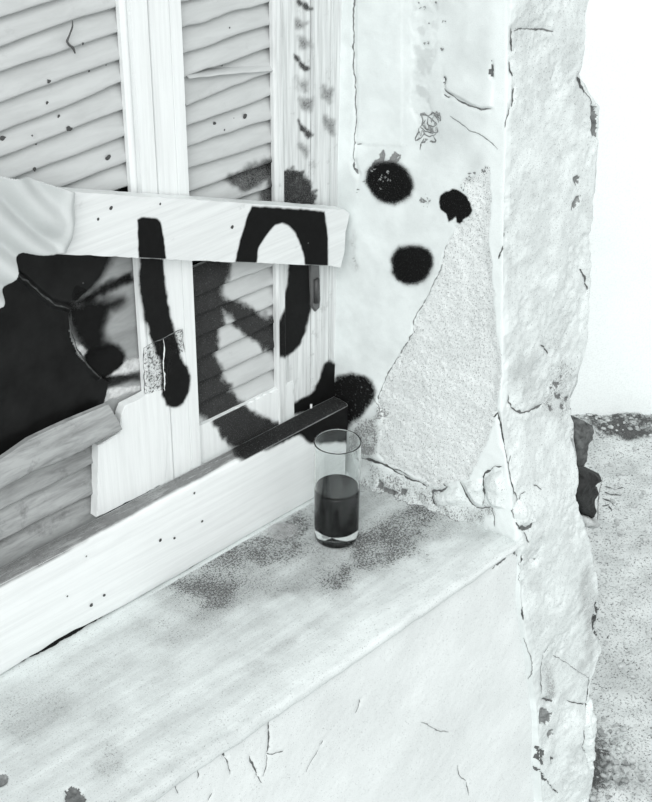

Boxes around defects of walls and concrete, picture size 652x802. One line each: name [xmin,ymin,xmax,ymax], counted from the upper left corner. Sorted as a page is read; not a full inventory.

crack [444,90,495,146]
spalling [378,166,503,488]
crack [362,245,542,580]
damp [170,407,494,631]
spalling [377,479,408,496]
crack [523,638,589,705]
crack [249,722,283,782]